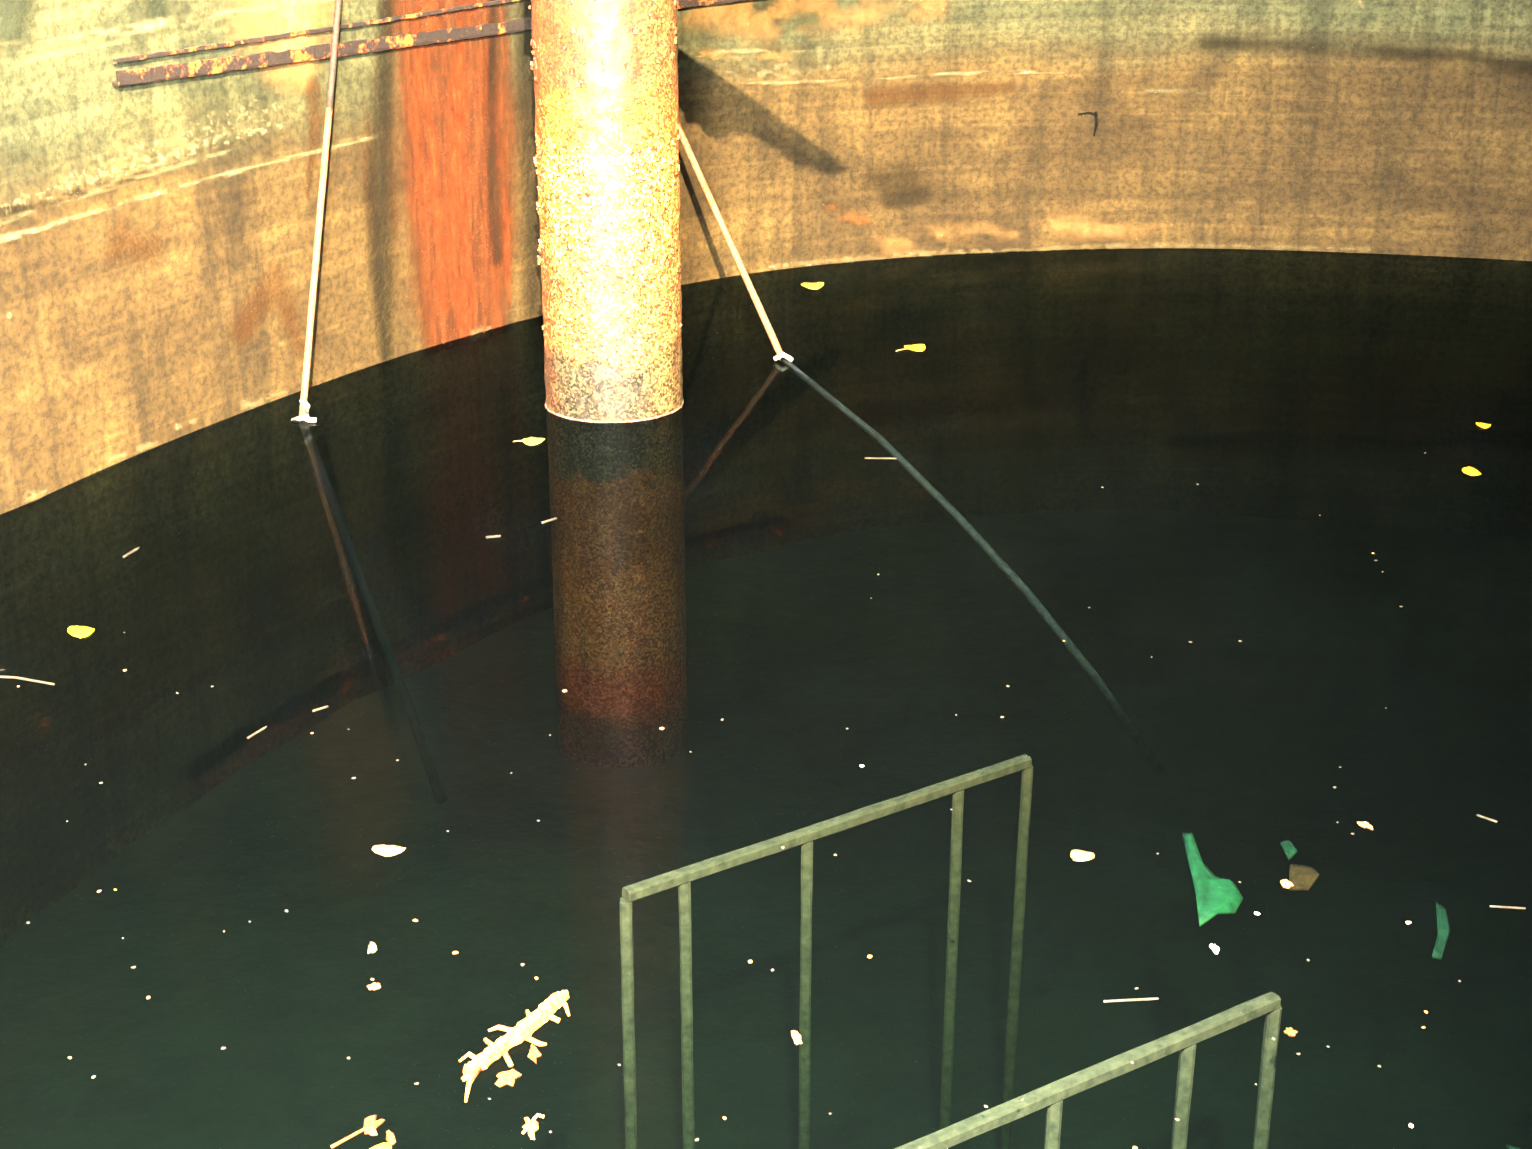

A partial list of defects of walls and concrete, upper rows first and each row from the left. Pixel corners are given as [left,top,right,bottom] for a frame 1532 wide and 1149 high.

corrosion [370,0,538,358]